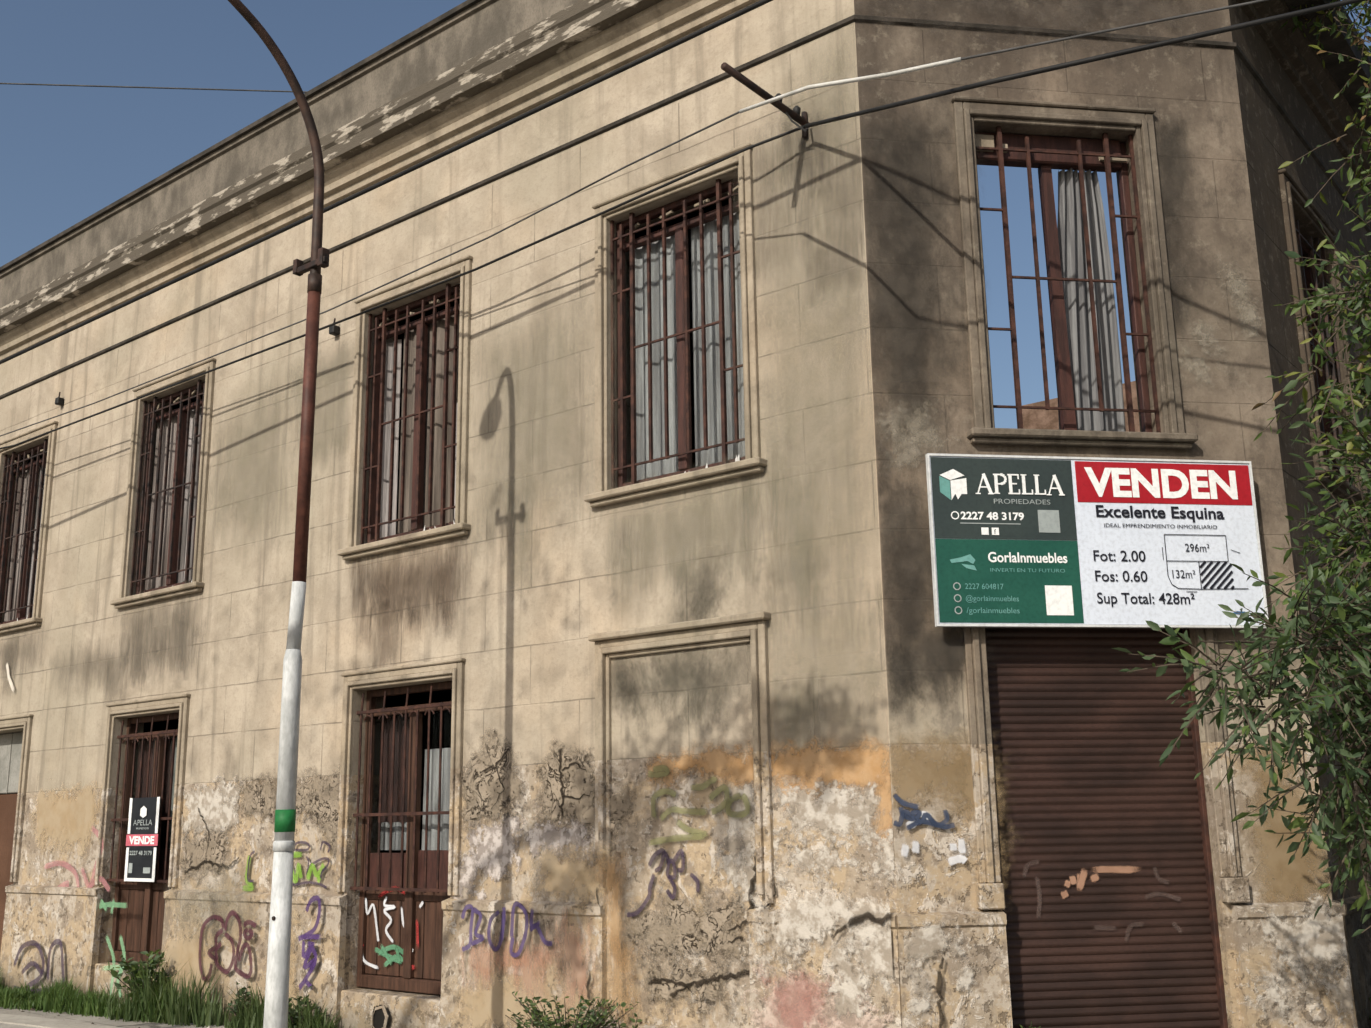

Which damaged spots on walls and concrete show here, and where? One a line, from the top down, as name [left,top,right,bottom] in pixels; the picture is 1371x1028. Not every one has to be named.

damp [1157,124,1185,258]
damp [864,119,952,428]
damp [372,553,451,657]
damp [881,498,965,705]
flaking render [296,767,353,861]
crack [481,748,509,809]
crack [558,749,592,818]
peeling [164,924,214,1001]
peeling [452,729,978,1028]
crack [832,912,892,941]
crack [930,956,945,1028]
peeling [1240,750,1354,1018]